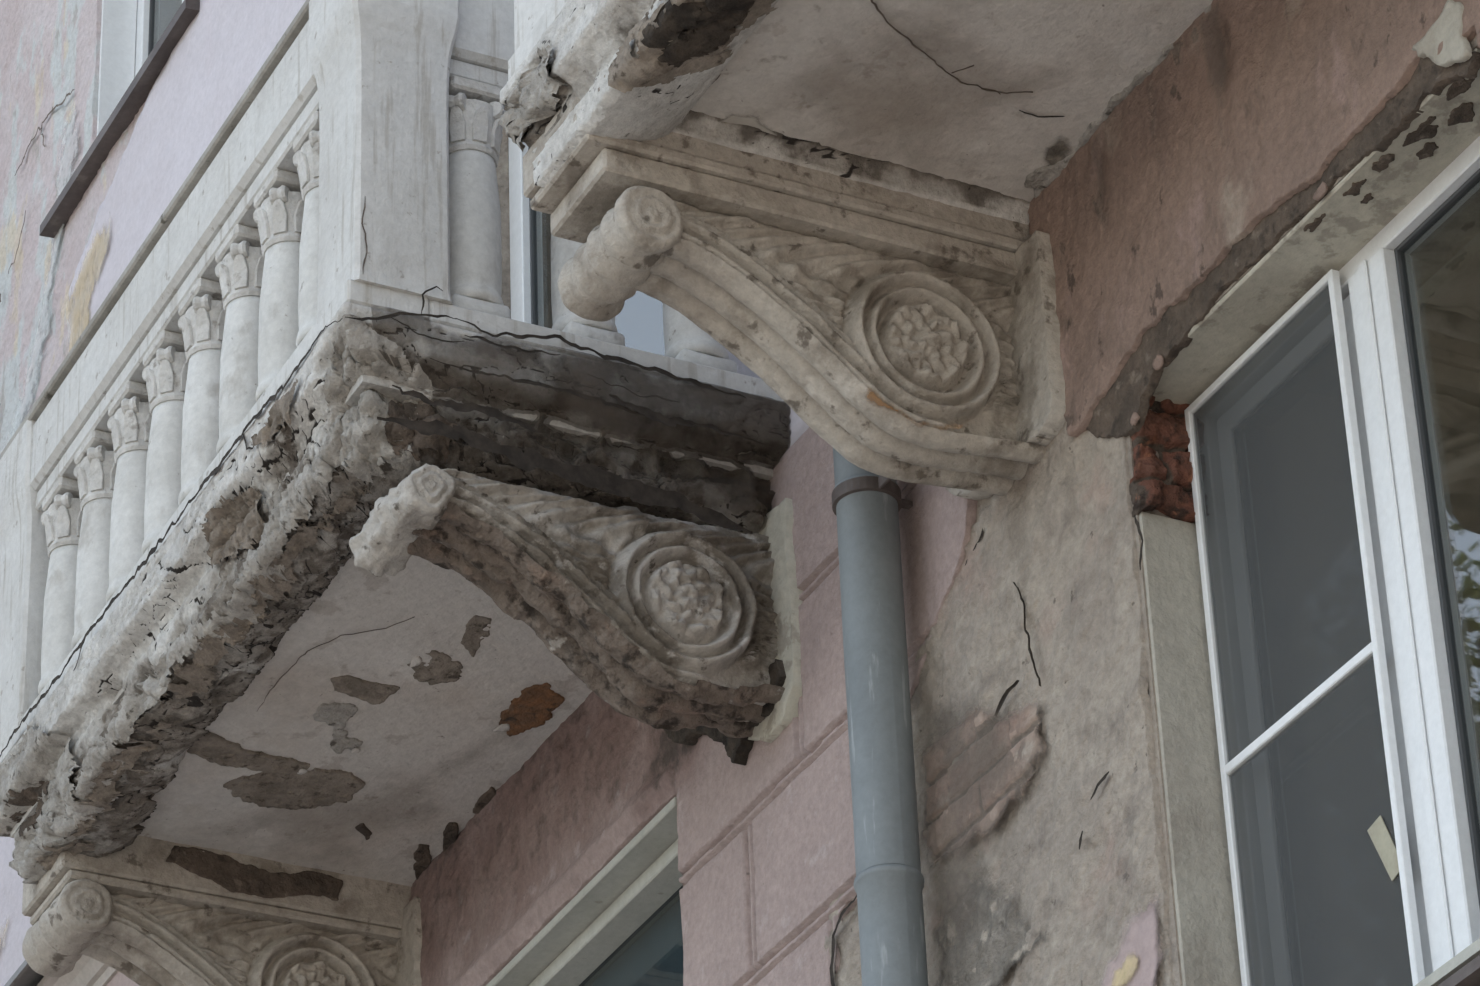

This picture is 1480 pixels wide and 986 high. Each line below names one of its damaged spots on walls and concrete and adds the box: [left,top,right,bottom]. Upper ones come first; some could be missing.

peeling [498,45,568,152]
spalling [598,0,777,93]
crack [870,0,1065,118]
peeling [57,110,78,195]
peeling [10,224,110,439]
flaking render [910,43,1480,986]
spalling [0,314,492,884]
crack [994,582,1041,716]
spalling [493,683,565,737]
spalling [473,787,496,814]
flaking render [824,893,862,986]